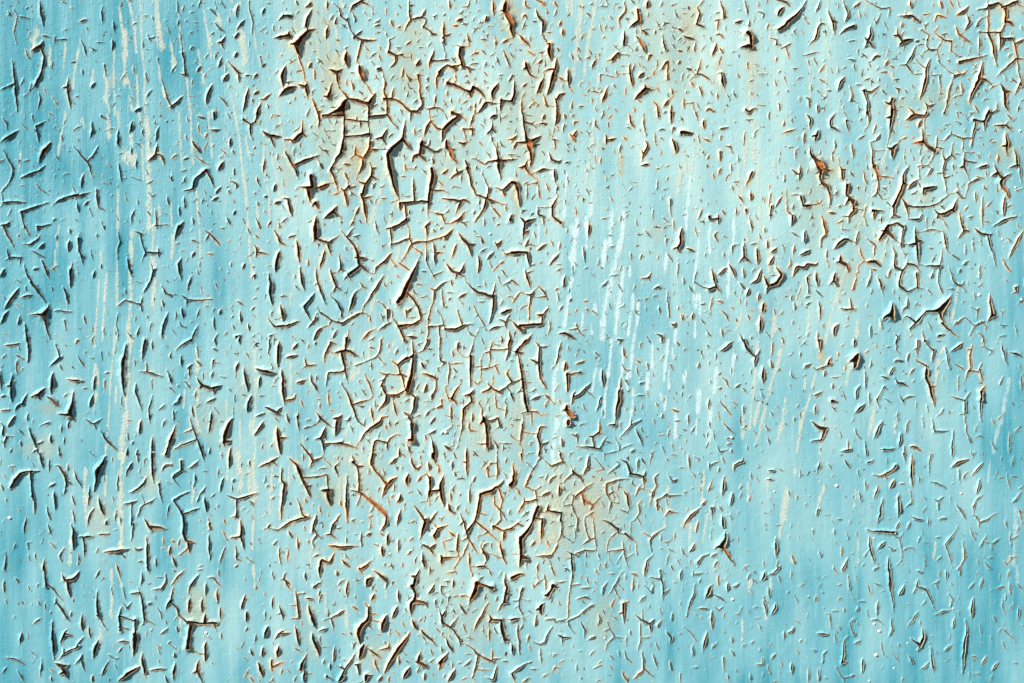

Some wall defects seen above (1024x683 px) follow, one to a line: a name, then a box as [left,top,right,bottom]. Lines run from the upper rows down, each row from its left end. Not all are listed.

crack [0,0,266,683]
crack [114,0,841,683]
crack [761,0,1024,683]